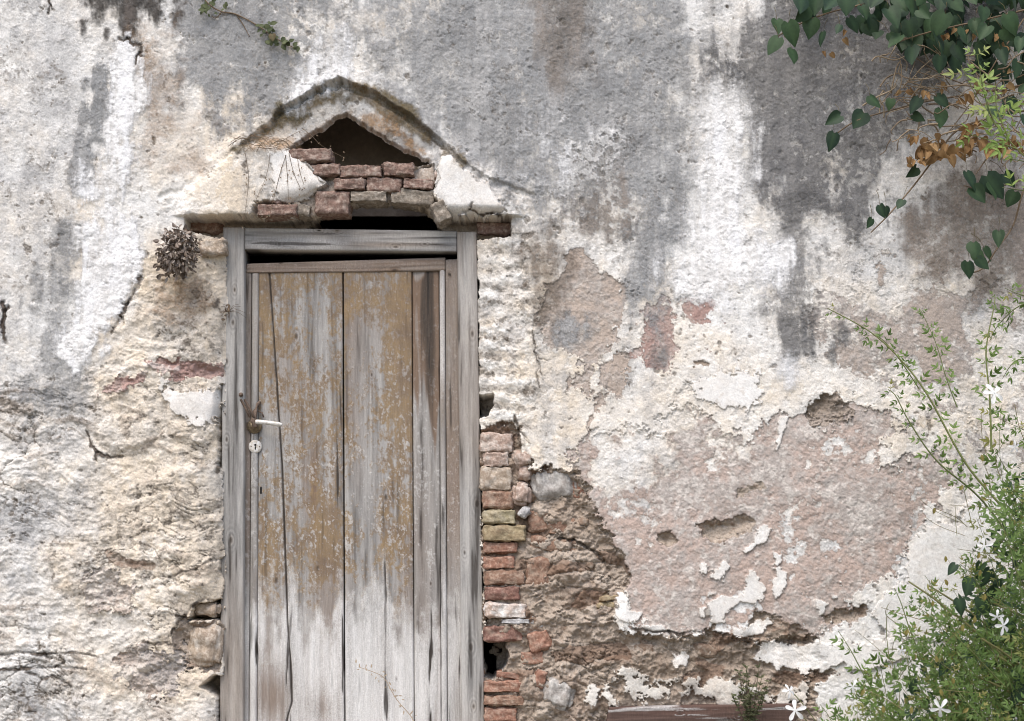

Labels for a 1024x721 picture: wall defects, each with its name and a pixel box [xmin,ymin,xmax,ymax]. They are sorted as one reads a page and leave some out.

peeling [257,148,323,213]
damp [19,0,988,411]
damp [904,166,1024,297]
crack [86,431,122,461]
flaking render [480,247,1024,721]